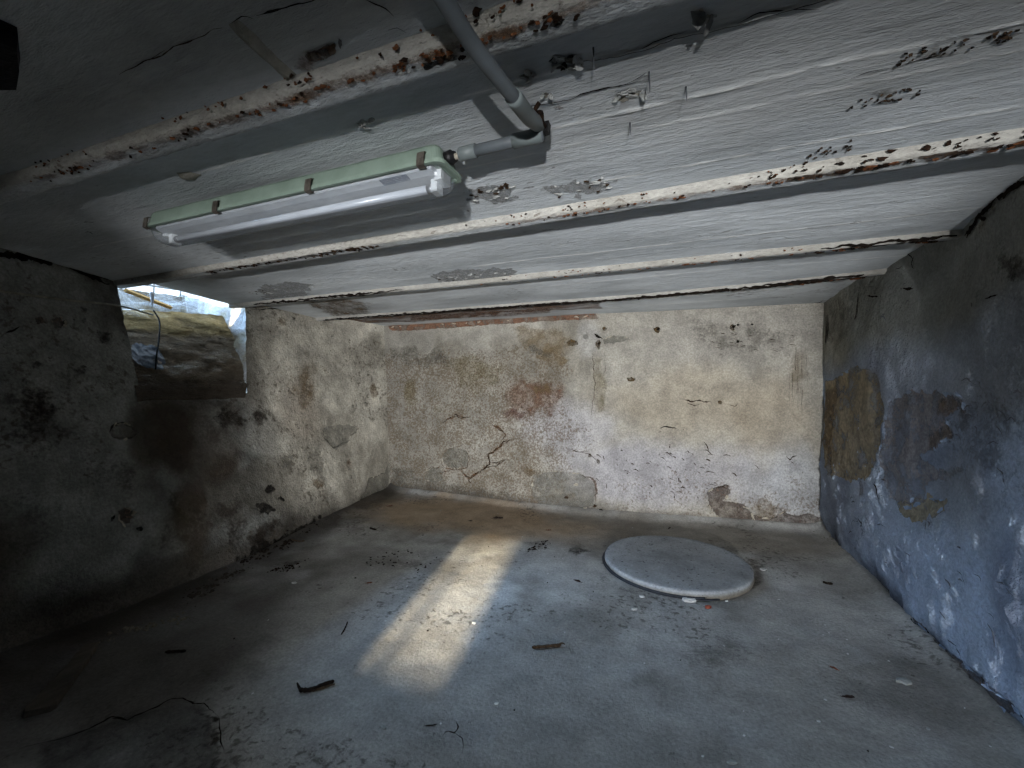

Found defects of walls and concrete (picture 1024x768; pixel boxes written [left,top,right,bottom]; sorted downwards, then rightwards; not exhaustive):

corrosion [465,0,558,45]
corrosion [347,44,465,84]
corrosion [30,61,335,182]
peeling [467,183,519,204]
peeling [545,177,617,199]
corrosion [544,192,686,221]
peeling [431,267,517,282]
corrosion [504,380,563,418]
peeling [822,365,884,486]
crack [443,414,517,483]
spalling [707,484,820,524]
crack [25,698,224,749]